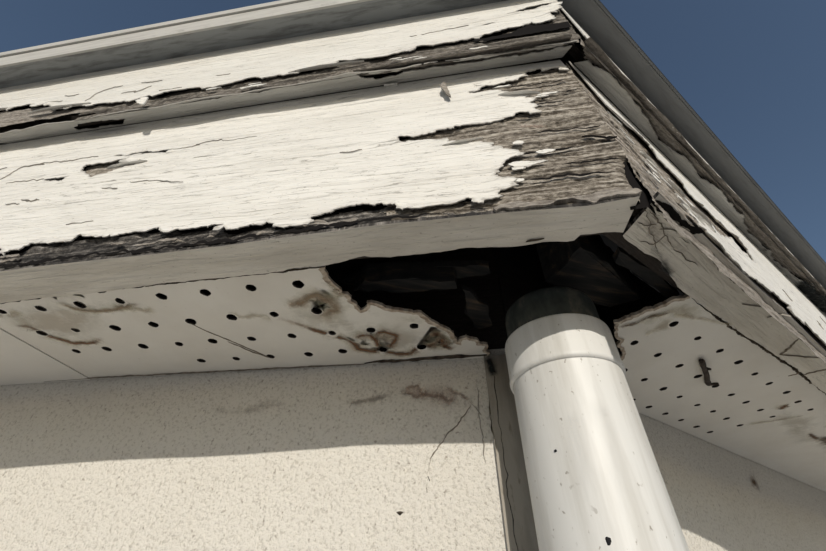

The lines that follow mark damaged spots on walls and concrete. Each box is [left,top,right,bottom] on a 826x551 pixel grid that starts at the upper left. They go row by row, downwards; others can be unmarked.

peeling [0,9,826,296]
crack [502,79,726,268]
crack [45,323,487,382]
leakage [291,293,339,315]
leakage [337,331,417,355]
spalling [613,294,690,360]
crack [426,376,518,549]